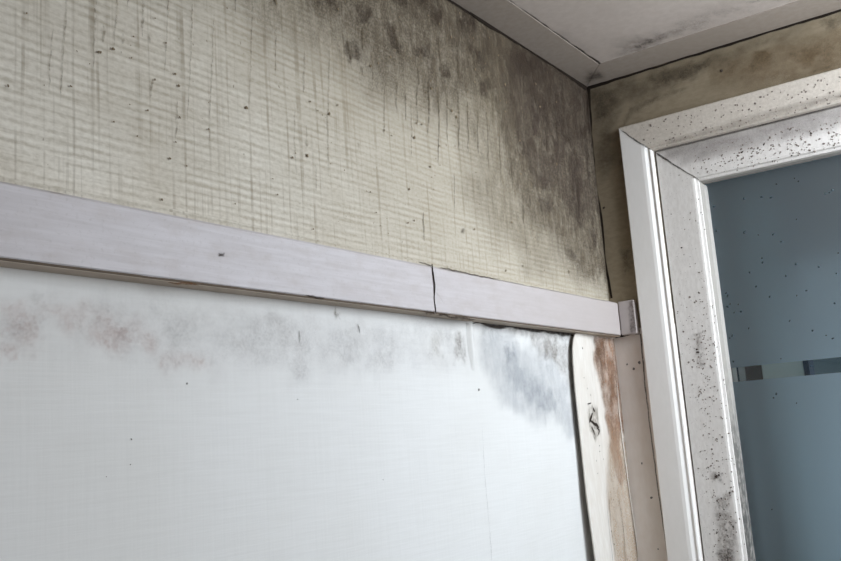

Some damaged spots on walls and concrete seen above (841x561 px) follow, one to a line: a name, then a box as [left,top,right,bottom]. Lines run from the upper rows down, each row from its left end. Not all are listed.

water stain [307,0,607,279]
water stain [643,78,841,146]
water stain [693,116,841,178]
water stain [466,322,574,336]
water stain [677,287,727,419]
water stain [596,438,637,561]
water stain [697,424,745,561]